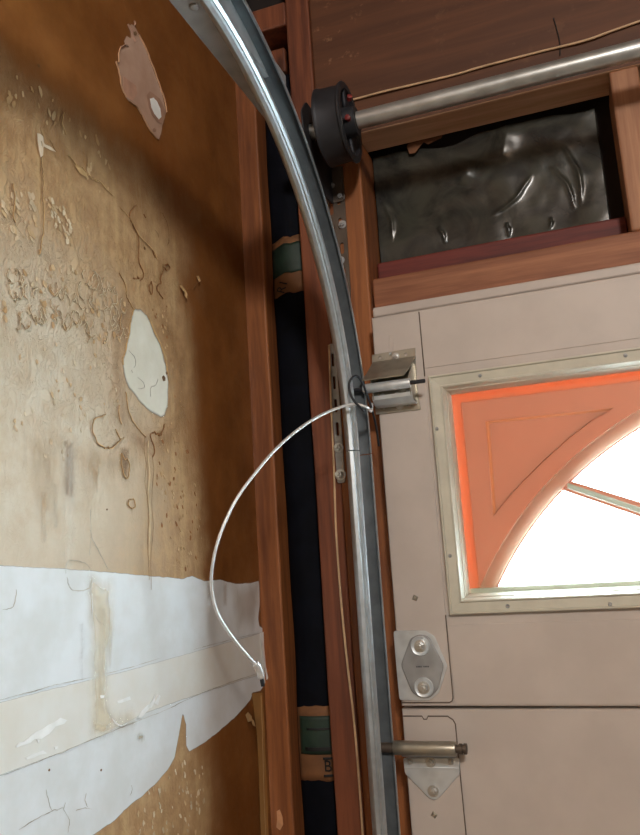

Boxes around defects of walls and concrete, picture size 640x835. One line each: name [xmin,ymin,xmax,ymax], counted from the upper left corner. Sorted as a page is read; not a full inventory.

peeling [6,86,56,157]
spalling [116,21,167,140]
peeling [46,196,73,246]
spalling [2,264,177,416]
crack [92,392,165,567]